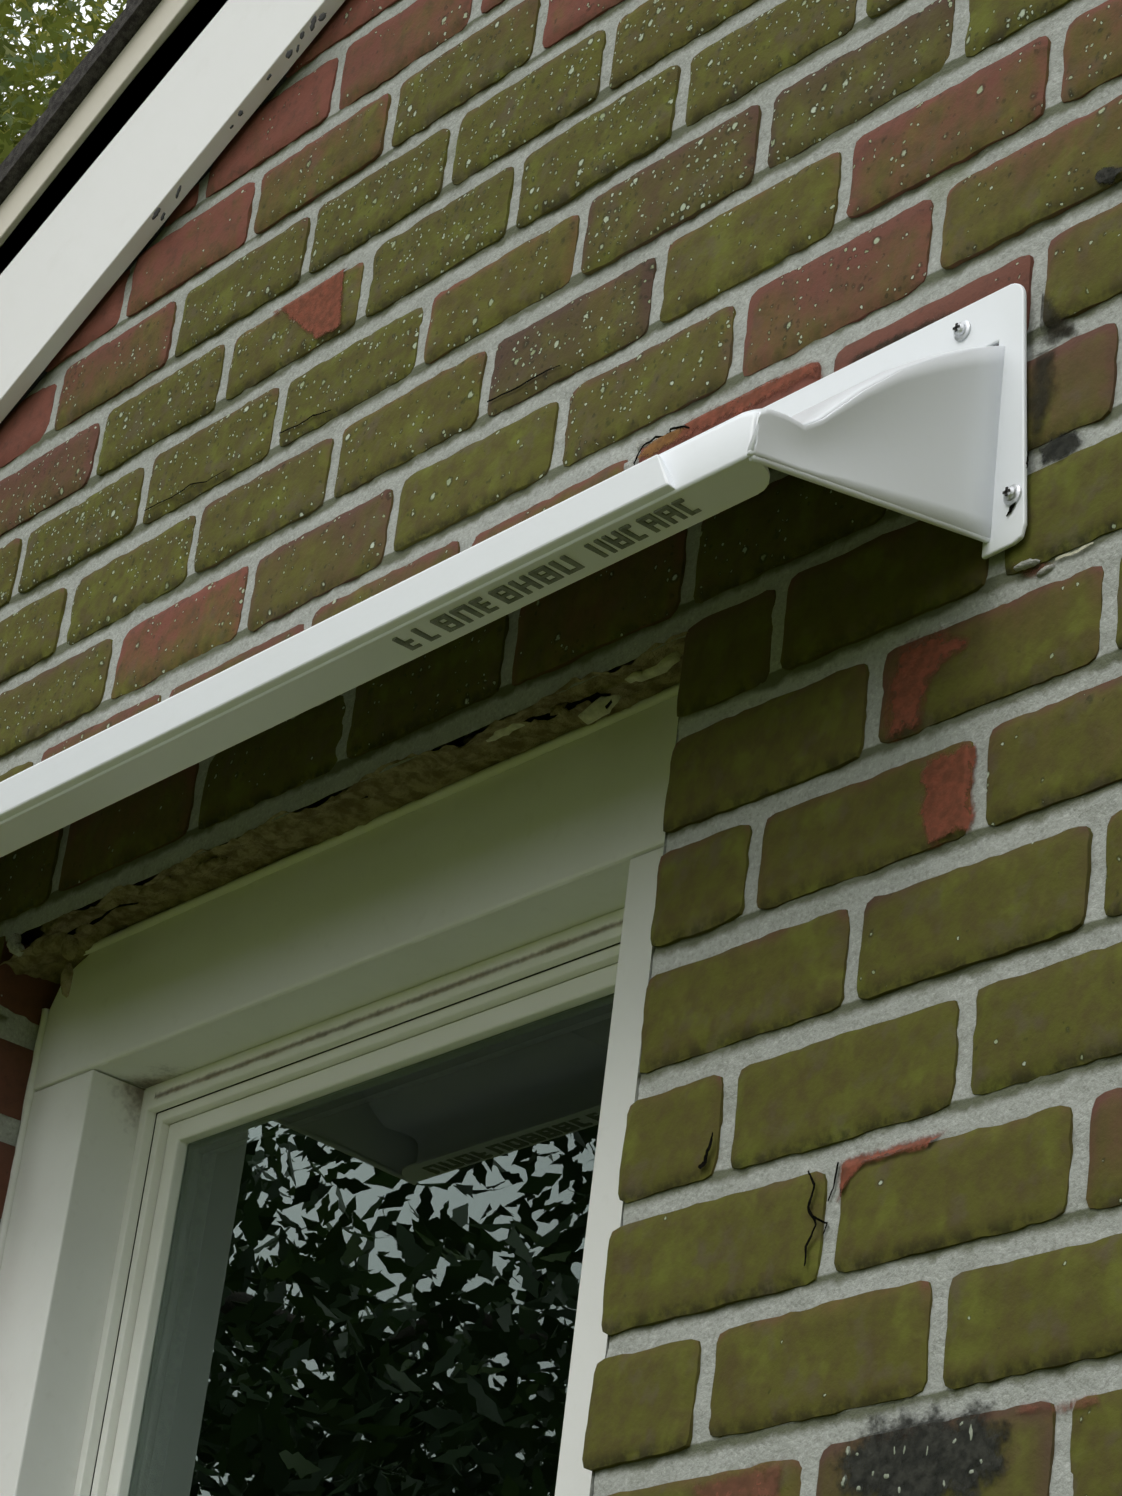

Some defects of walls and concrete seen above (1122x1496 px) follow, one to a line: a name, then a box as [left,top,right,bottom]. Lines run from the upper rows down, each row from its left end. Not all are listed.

spalling [0,631,689,998]
crack [804,1162,839,1266]
damp [836,1402,1009,1496]